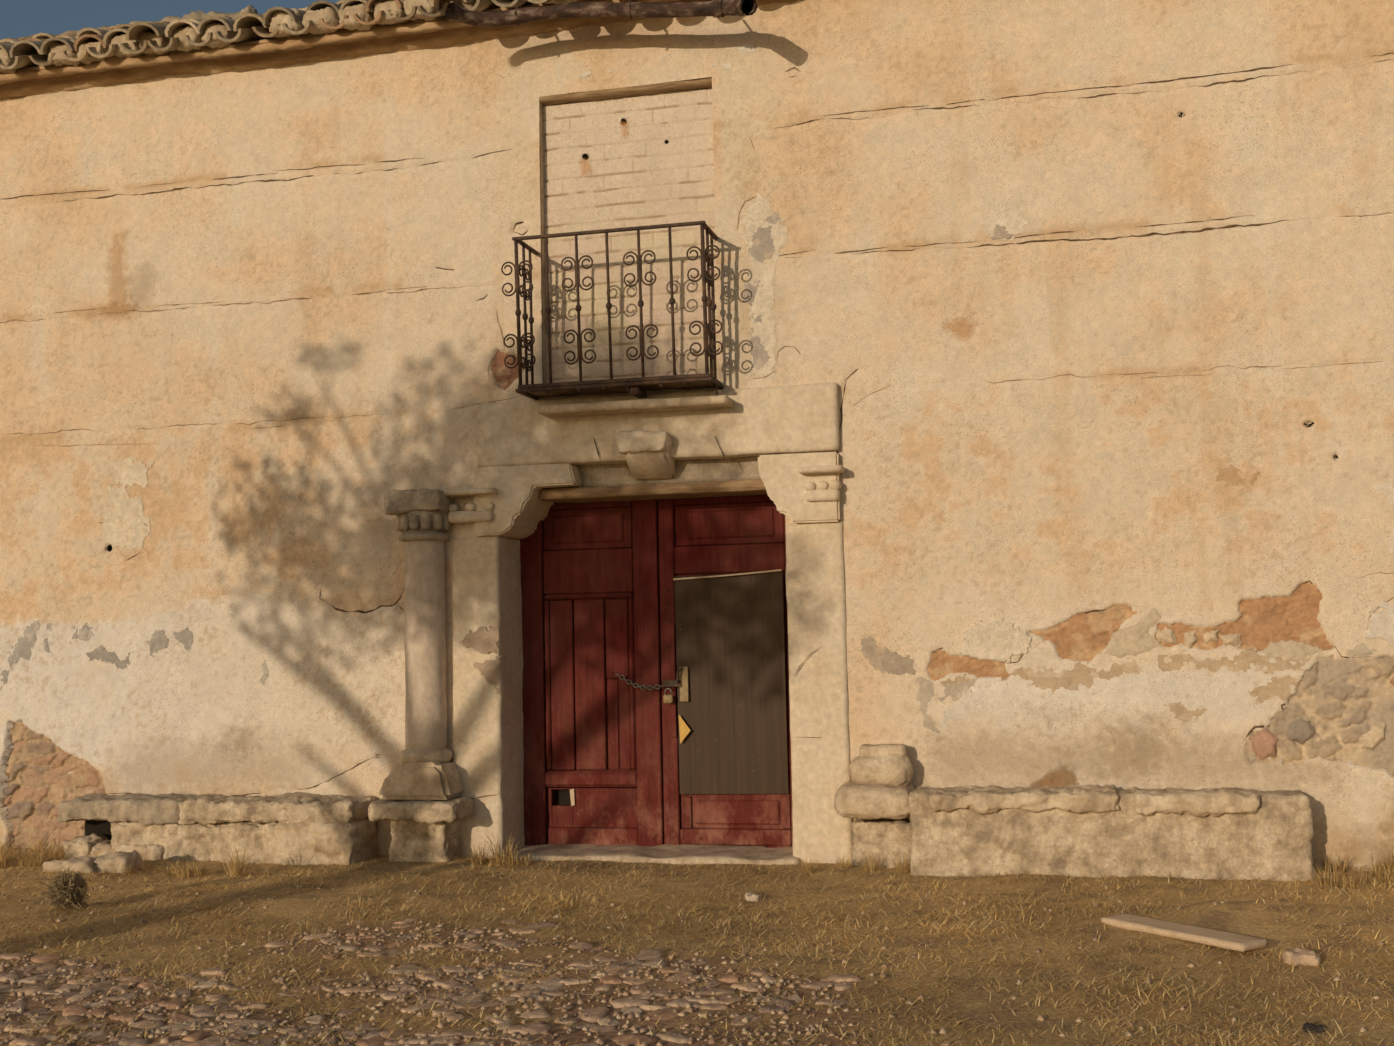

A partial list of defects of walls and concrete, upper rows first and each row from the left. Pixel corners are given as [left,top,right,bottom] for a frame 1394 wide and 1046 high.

crack [3,149,512,208]
crack [780,212,1391,258]
peeling [741,190,789,381]
flaking render [491,350,524,390]
peeling [0,621,53,690]
peeling [71,623,194,669]
peeling [460,625,501,694]
flaking render [860,583,1394,777]
flaking render [3,720,106,850]